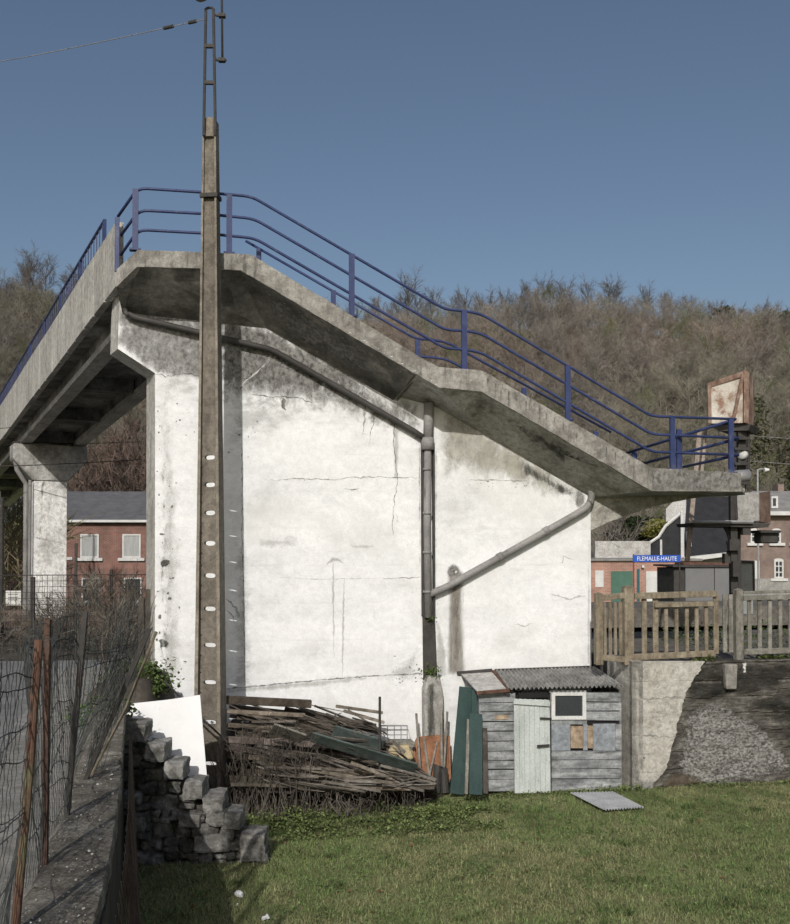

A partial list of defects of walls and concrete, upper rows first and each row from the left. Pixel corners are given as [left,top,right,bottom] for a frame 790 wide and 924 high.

crack [238,355,310,410]
damp [221,299,416,425]
crack [265,406,408,530]
damp [446,418,565,493]
damp [535,436,580,461]
damp [449,571,462,672]
damp [691,663,790,697]